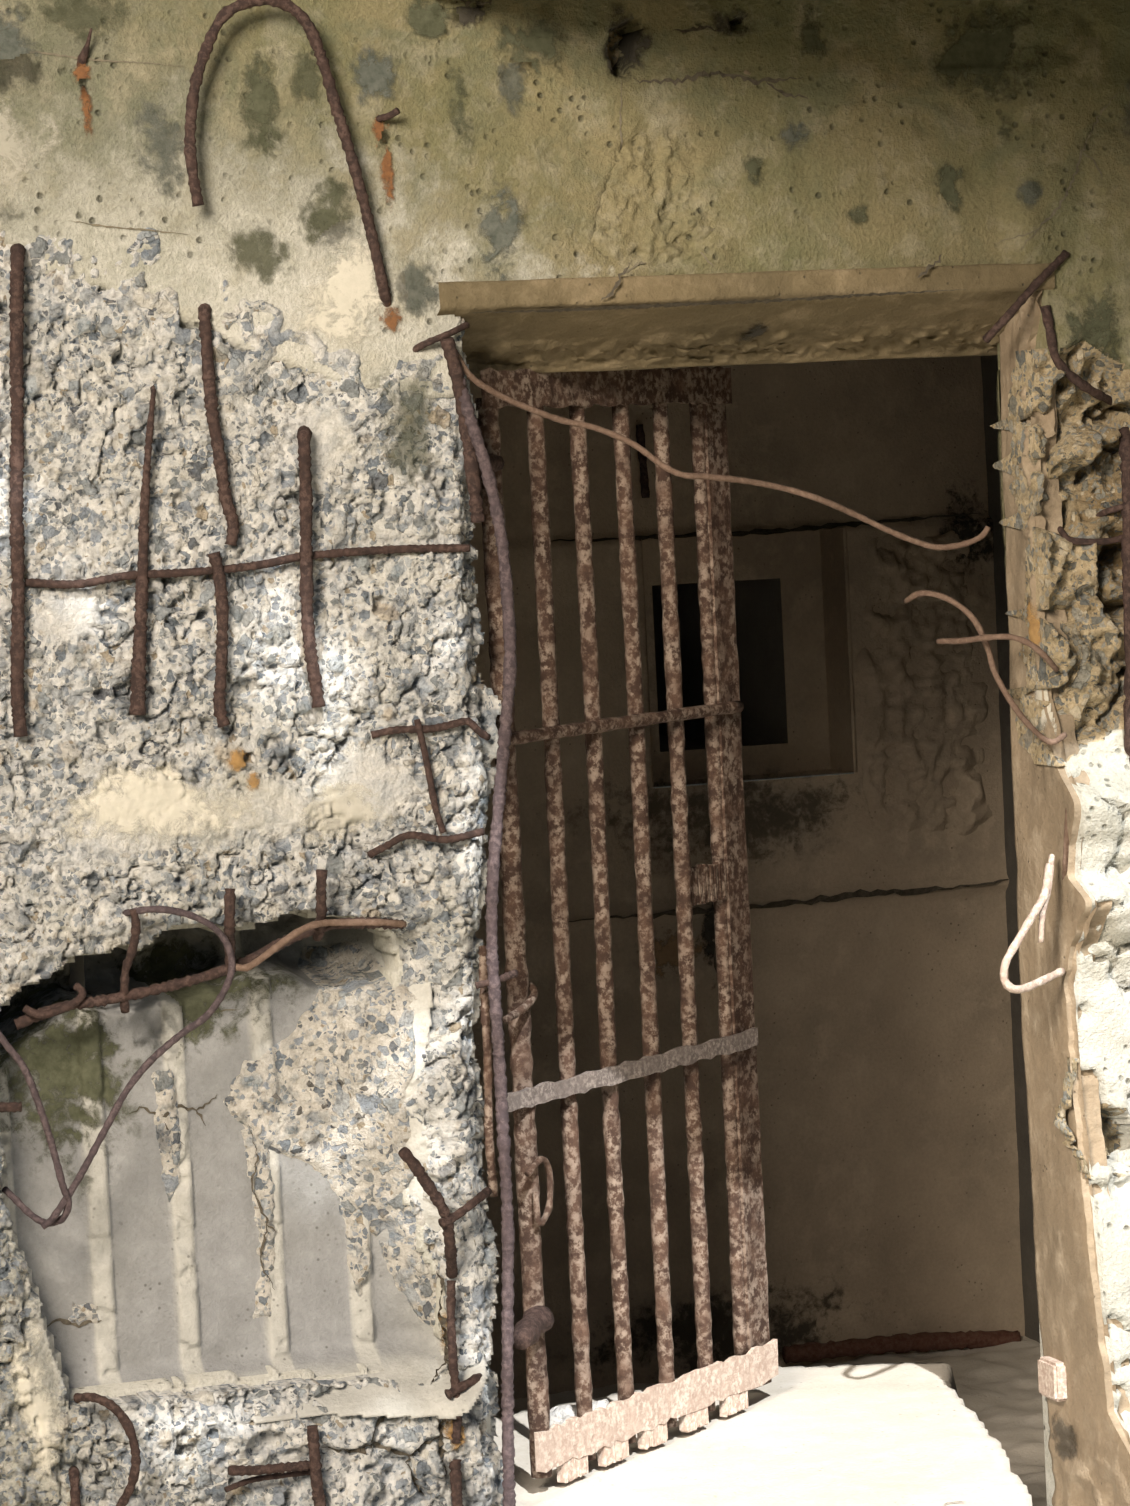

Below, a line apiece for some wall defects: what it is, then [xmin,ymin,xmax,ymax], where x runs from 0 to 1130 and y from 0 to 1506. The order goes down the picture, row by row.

leakage [455,0,486,25]
spalling [606,30,623,71]
leakage [605,8,652,74]
corrosion [73,63,92,133]
corrosion [372,119,394,199]
corrosion [380,307,402,331]
spalling [982,250,1130,767]
corrosion [228,749,260,789]
spalling [0,227,518,1506]
leakage [0,972,140,1164]